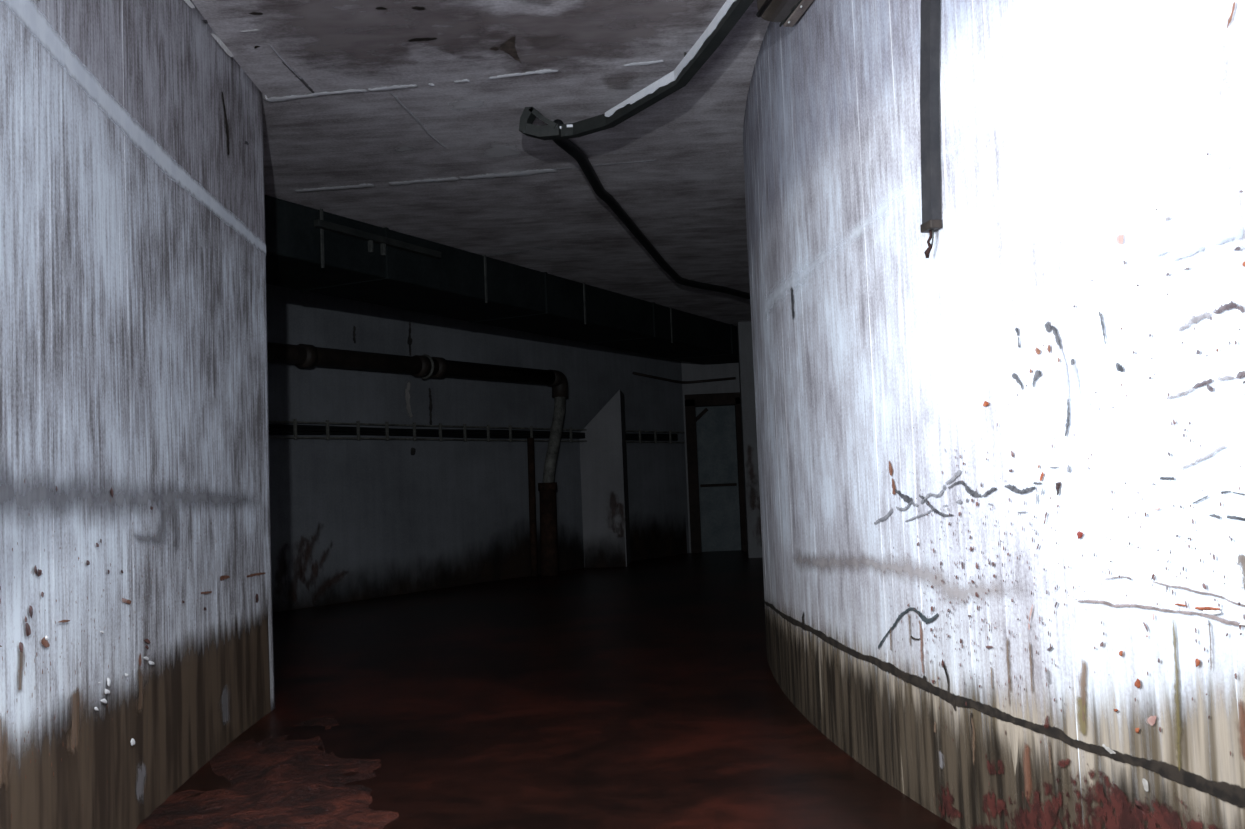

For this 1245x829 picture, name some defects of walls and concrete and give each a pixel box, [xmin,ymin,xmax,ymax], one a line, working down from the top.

damp [248,0,713,73]
damp [1237,554,1245,589]
damp [0,533,541,829]
crack [764,600,1245,808]
damp [765,606,1245,829]